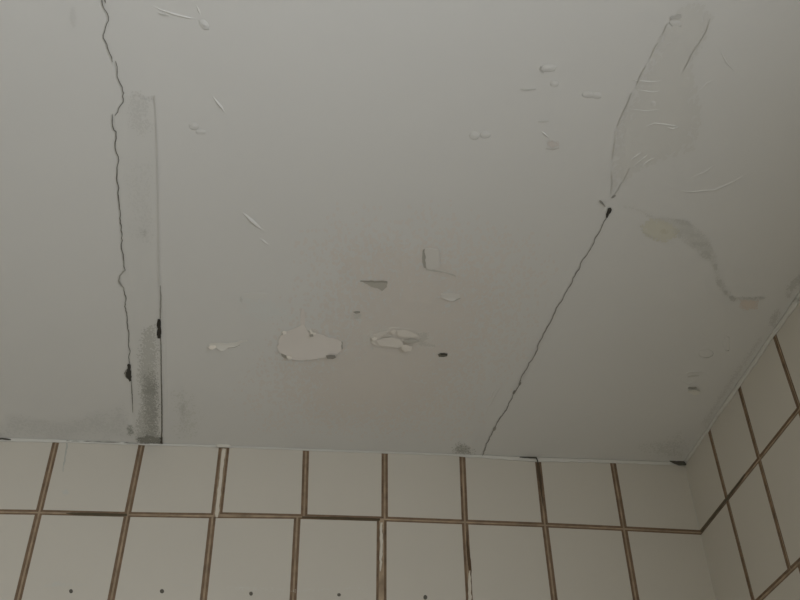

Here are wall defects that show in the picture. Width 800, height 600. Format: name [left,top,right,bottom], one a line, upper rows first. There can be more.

damp [0,324,163,470]
crack [102,0,133,411]
peeling [277,324,343,360]
crack [482,170,629,456]